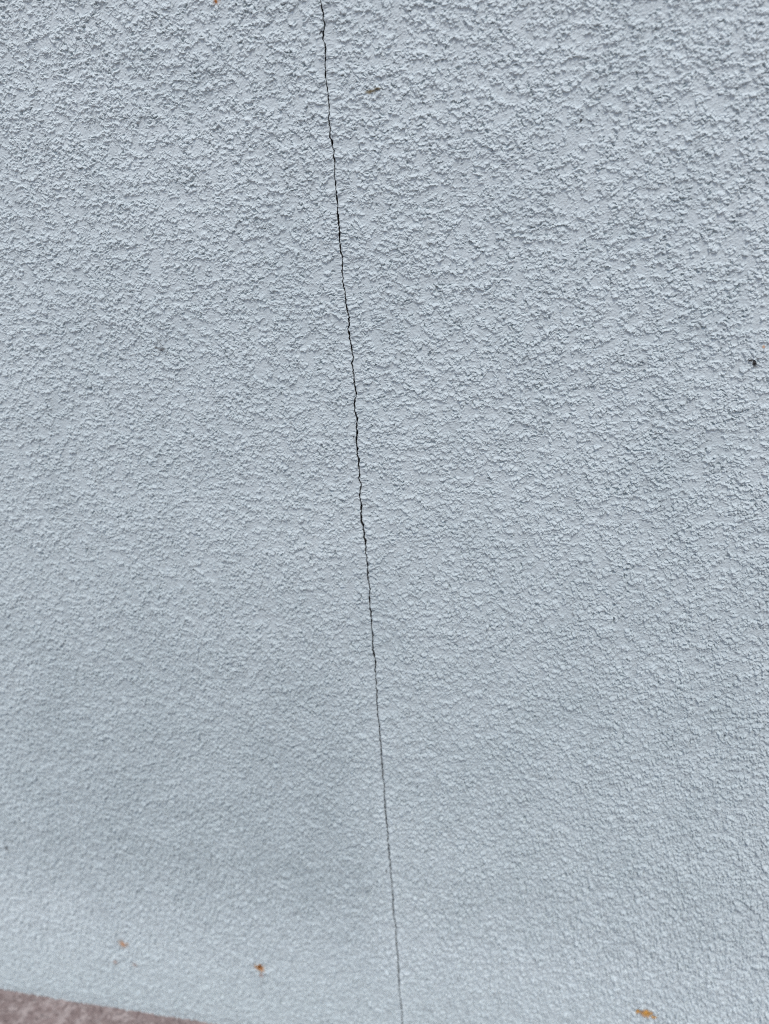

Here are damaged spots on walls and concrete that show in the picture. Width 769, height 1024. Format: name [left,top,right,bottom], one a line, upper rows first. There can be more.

crack [319,0,403,1024]